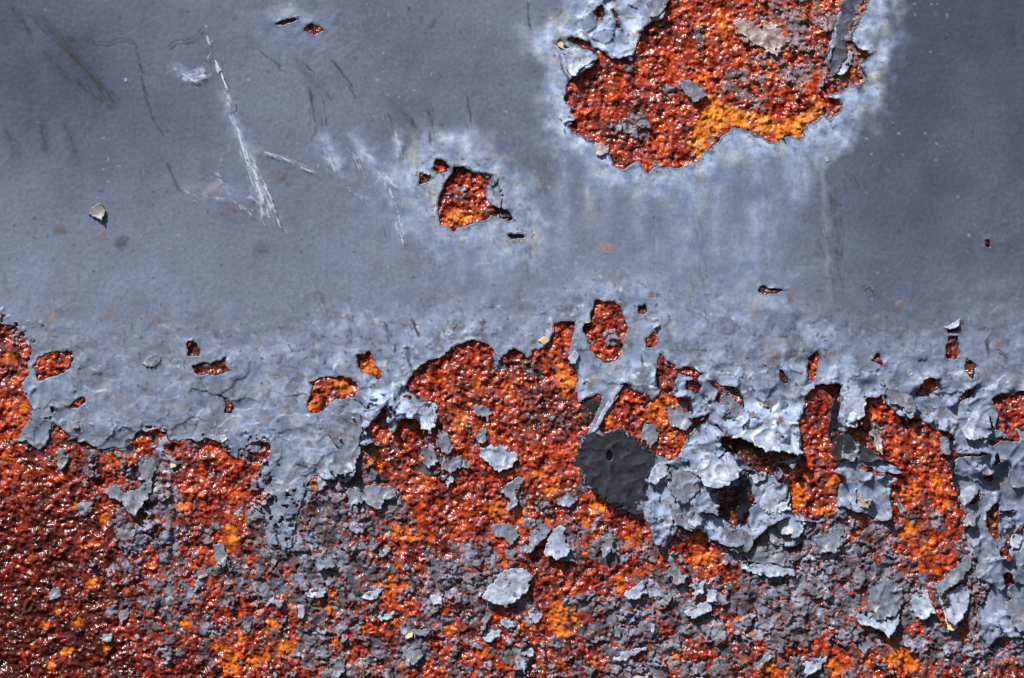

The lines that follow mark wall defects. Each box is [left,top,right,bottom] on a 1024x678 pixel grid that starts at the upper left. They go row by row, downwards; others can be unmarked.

corrosion [559,0,869,173]
corrosion [419,159,512,232]
corrosion [945,318,977,379]
peeling [640,401,694,448]
peeling [720,387,804,455]
peeling [842,385,867,428]
corrosion [779,351,1024,534]
peeling [879,382,950,431]
corrosion [0,300,743,678]
peeling [647,449,1024,678]
corrosion [1002,554,1015,589]